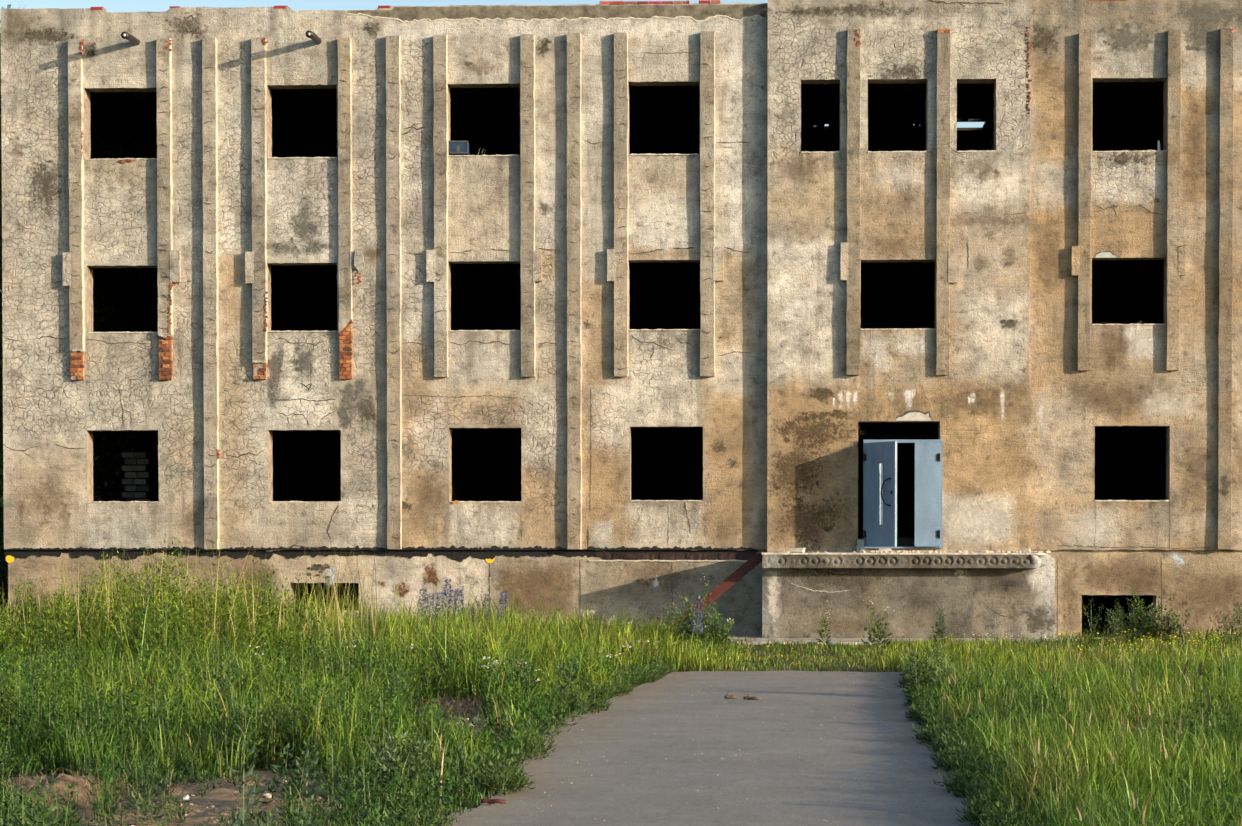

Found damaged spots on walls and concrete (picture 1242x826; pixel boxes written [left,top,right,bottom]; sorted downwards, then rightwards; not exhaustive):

water stain [1033,23,1060,54]
water stain [1101,24,1158,55]
water stain [1099,152,1157,166]
crack [3,0,1025,623]
spalling [158,278,181,380]
spalling [70,348,85,380]
spalling [339,318,352,379]
water stain [833,391,857,408]
rust [424,565,439,584]